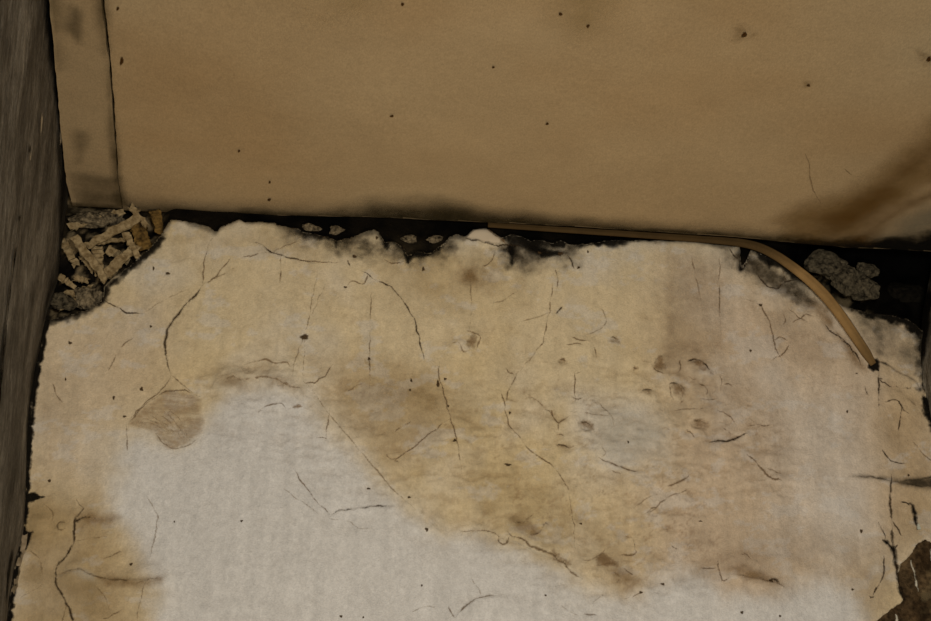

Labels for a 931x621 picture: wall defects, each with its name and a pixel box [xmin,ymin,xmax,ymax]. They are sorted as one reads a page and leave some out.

peeling [468,230,505,243]
damp [786,186,931,251]
crack [135,248,460,462]
crack [758,276,797,357]
crack [7,306,58,621]
crack [713,413,778,480]
crack [856,362,931,460]
crack [55,512,81,620]
crack [870,450,905,600]
spalling [877,540,931,621]